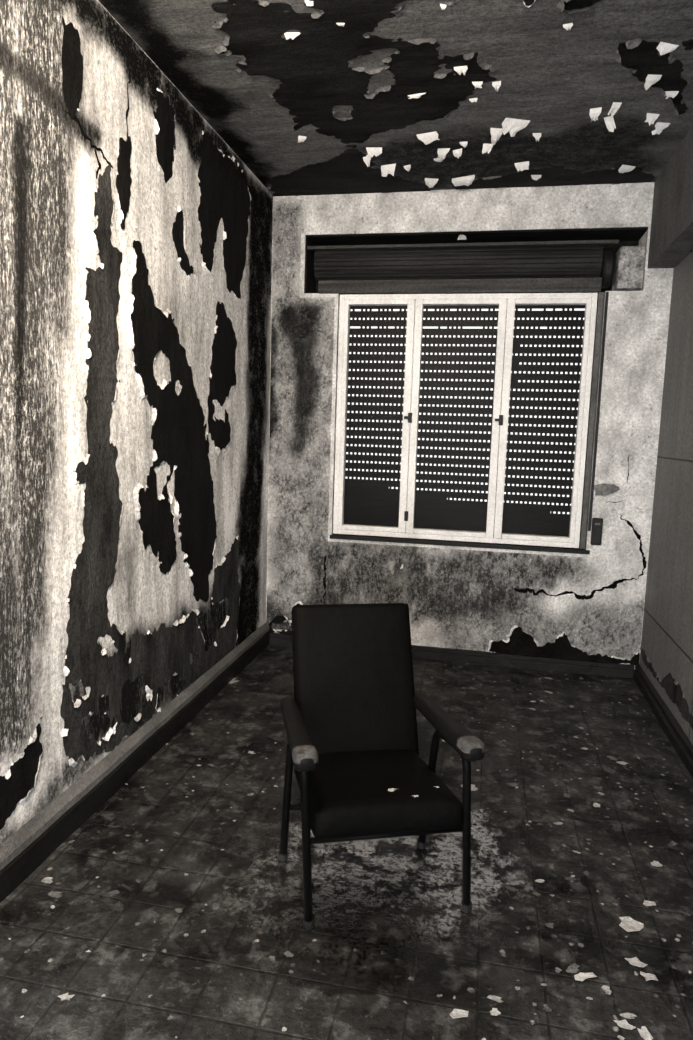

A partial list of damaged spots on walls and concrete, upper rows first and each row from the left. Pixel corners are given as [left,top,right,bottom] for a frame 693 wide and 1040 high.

peeling [61,17,83,120]
peeling [153,88,176,183]
peeling [211,0,501,196]
peeling [482,118,541,154]
peeling [452,161,655,190]
peeling [589,102,622,132]
peeling [615,38,693,135]
leakage [0,0,656,761]
peeling [60,130,251,767]
crack [514,455,647,600]
peeling [0,717,44,831]
leakage [34,755,97,816]